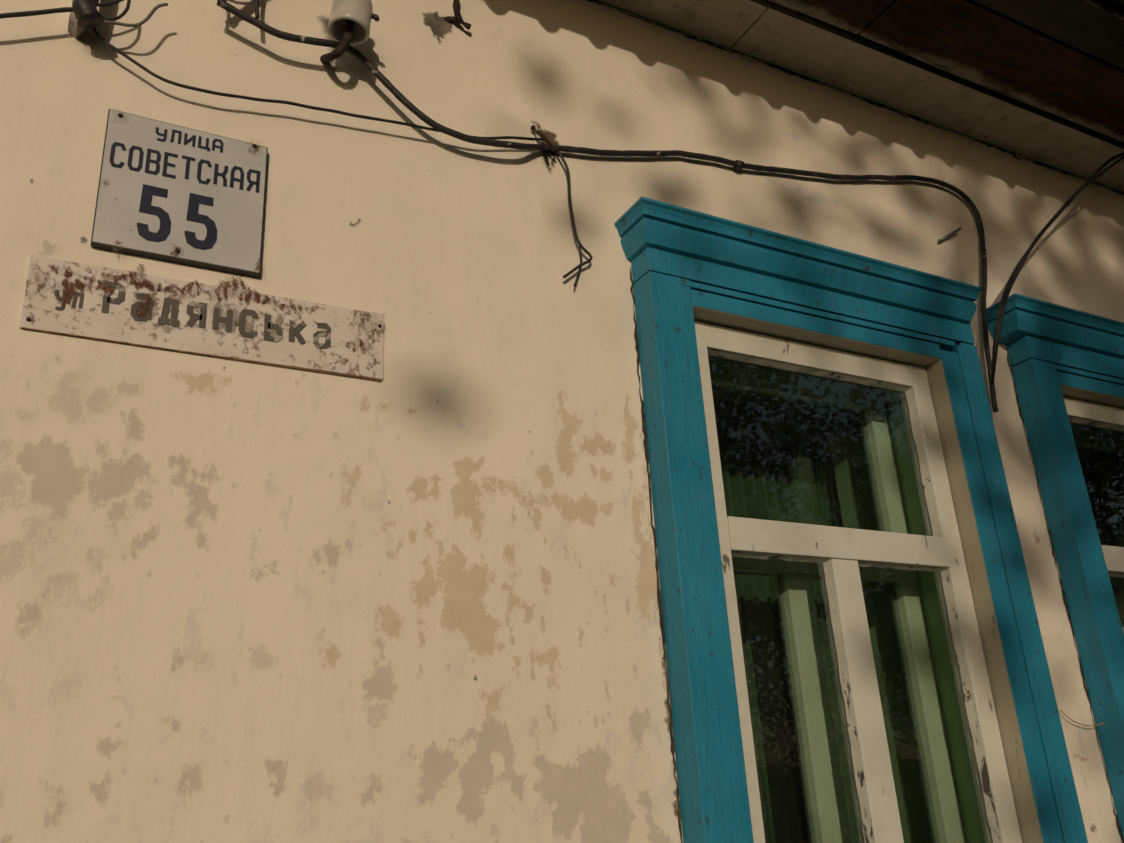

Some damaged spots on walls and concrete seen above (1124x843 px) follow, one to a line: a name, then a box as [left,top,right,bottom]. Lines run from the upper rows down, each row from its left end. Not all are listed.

peeling [353,389,683,843]